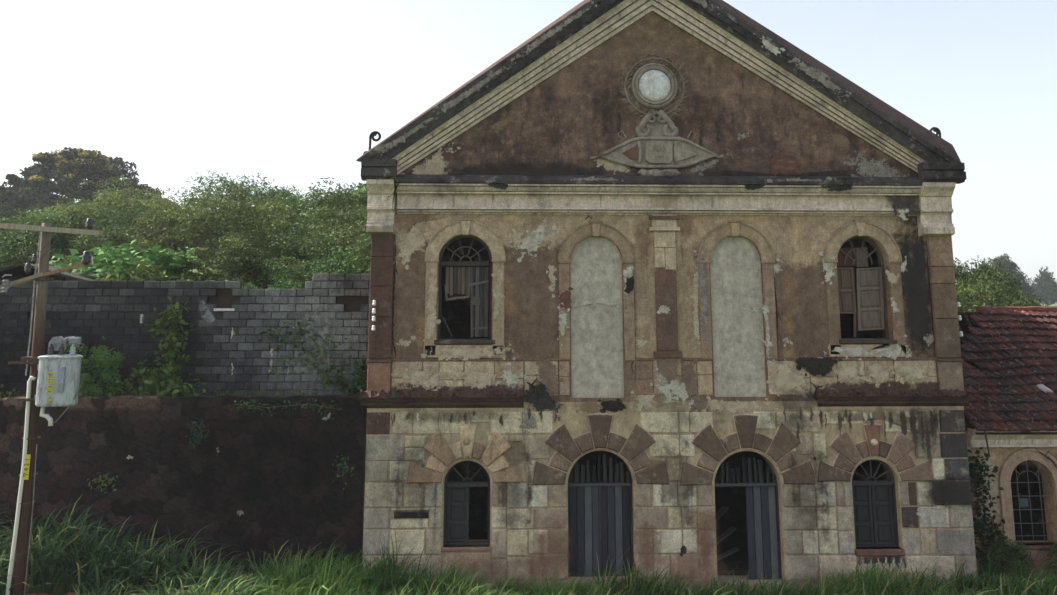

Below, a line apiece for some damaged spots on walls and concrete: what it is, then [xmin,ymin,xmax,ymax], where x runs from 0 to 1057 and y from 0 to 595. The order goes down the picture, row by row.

peeling [753,33,852,102]
peeling [394,221,431,270]
peeling [508,217,573,346]
peeling [391,265,527,391]
peeling [576,250,934,414]
leakage [516,379,567,423]
leakage [782,406,938,464]
leakage [926,476,974,506]